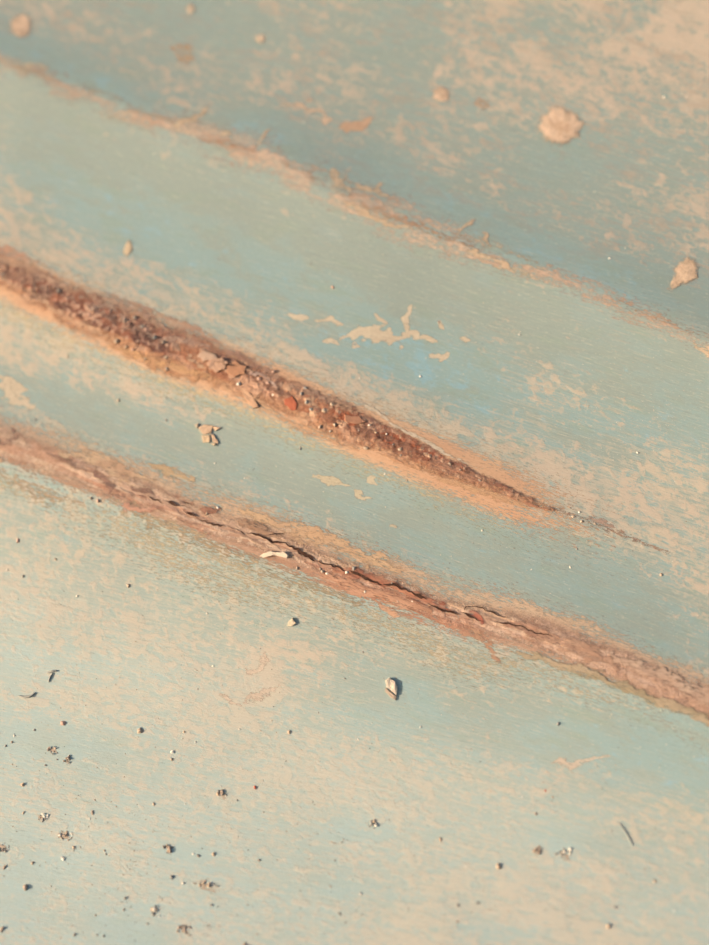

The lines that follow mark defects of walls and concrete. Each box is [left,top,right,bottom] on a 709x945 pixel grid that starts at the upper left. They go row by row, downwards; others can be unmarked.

peeling [279,98,374,135]
corrosion [0,236,667,567]
corrosion [0,54,709,358]
peeling [288,304,450,362]
crack [147,495,551,636]
corrosion [0,406,709,726]